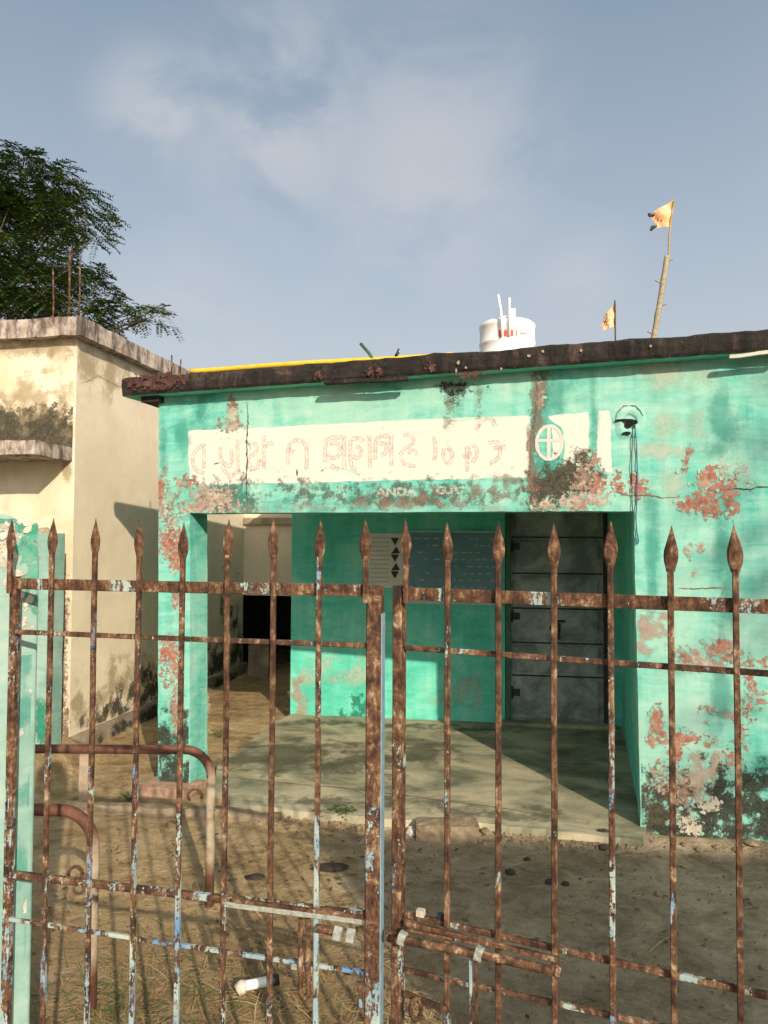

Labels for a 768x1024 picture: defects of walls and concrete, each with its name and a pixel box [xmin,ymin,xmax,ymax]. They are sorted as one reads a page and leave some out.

damp [0,395,73,448]
peeling [156,467,246,577]
crack [243,404,251,500]
damp [435,381,481,425]
rust [526,370,549,511]
peeling [528,449,649,512]
peeling [672,443,764,523]
peeling [0,516,39,640]
damp [207,595,243,692]
damp [70,664,189,783]
peeling [644,638,768,837]
damp [641,751,768,842]